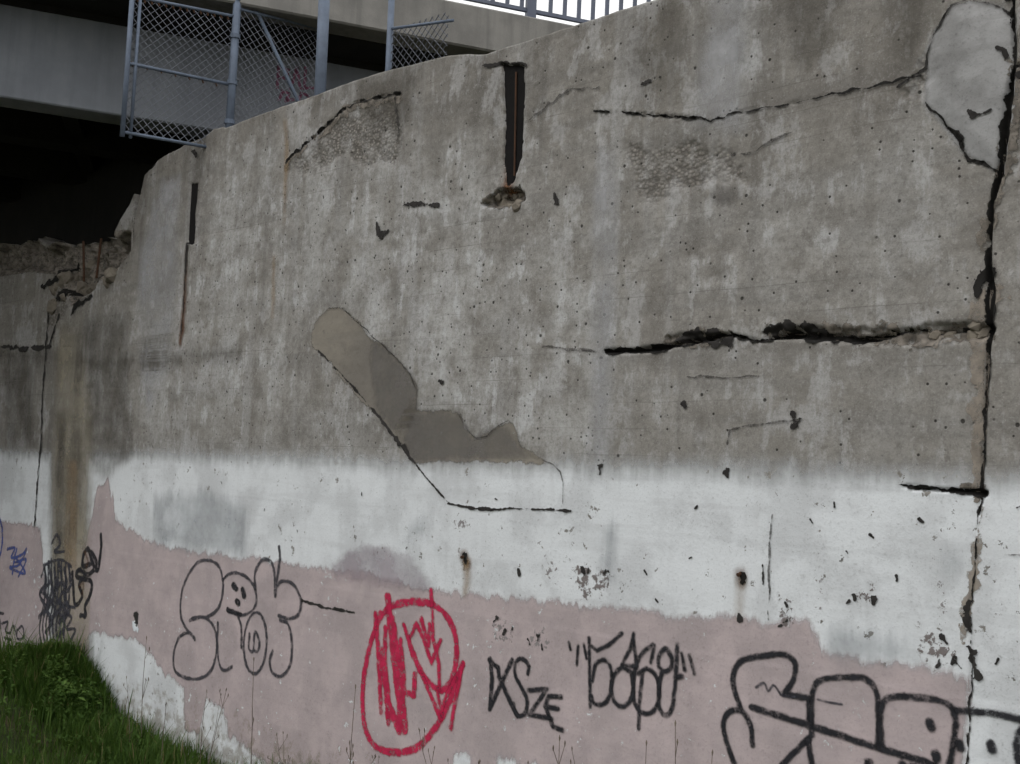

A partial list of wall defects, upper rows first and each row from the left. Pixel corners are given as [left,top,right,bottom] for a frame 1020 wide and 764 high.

crack [284,91,403,172]
spalling [0,230,134,315]
crack [180,242,190,340]
crack [1,312,60,525]
peeling [311,307,544,465]
crack [529,0,1020,764]
leakage [56,417,85,624]